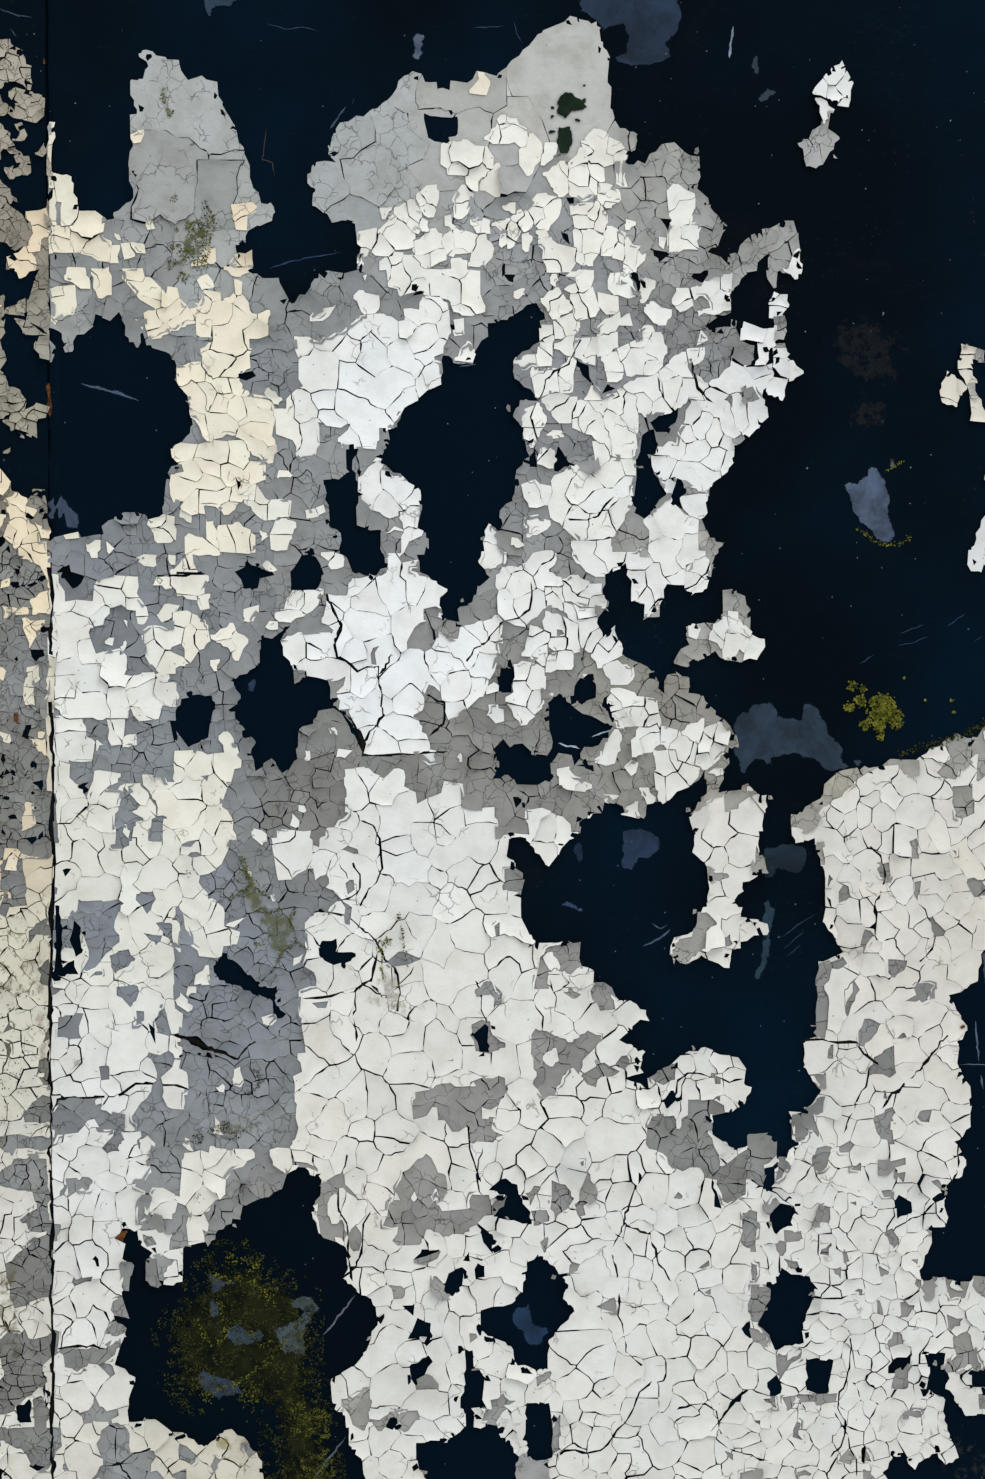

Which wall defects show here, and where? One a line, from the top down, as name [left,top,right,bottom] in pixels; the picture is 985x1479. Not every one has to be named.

peeling [204,0,236,16]
peeling [413,34,424,59]
peeling [0,39,571,755]
crack [658,364,711,410]
peeling [939,344,985,422]
peeling [416,0,853,979]
crack [327,598,445,757]
crack [311,946,413,1041]
peeling [0,459,985,1479]
crack [48,702,100,1479]
crack [803,1038,944,1132]
crack [612,1177,670,1364]